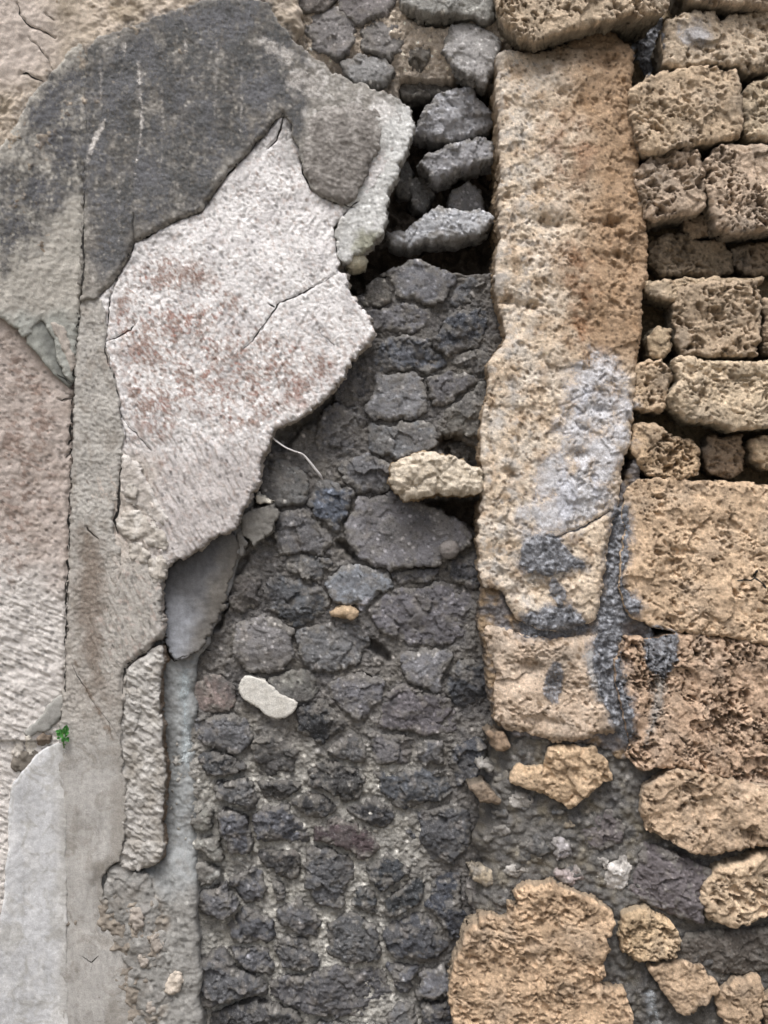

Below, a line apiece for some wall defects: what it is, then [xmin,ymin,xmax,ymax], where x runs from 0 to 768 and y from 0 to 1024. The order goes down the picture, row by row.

crack [57,113,284,733]
crack [243,276,332,350]
flaking render [103,454,281,1024]